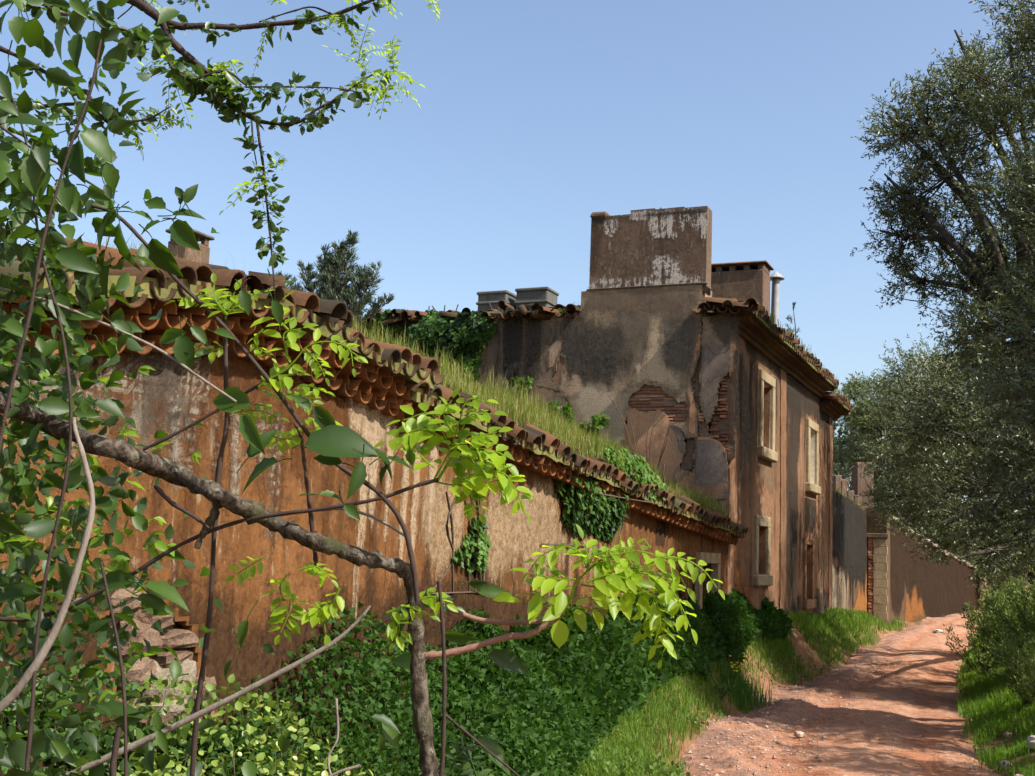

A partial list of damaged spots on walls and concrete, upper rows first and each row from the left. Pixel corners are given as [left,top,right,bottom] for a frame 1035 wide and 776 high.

peeling [589,256,700,289]
peeling [604,206,709,240]
water stain [480,291,867,616]
peeling [624,359,737,484]
water stain [0,348,619,753]